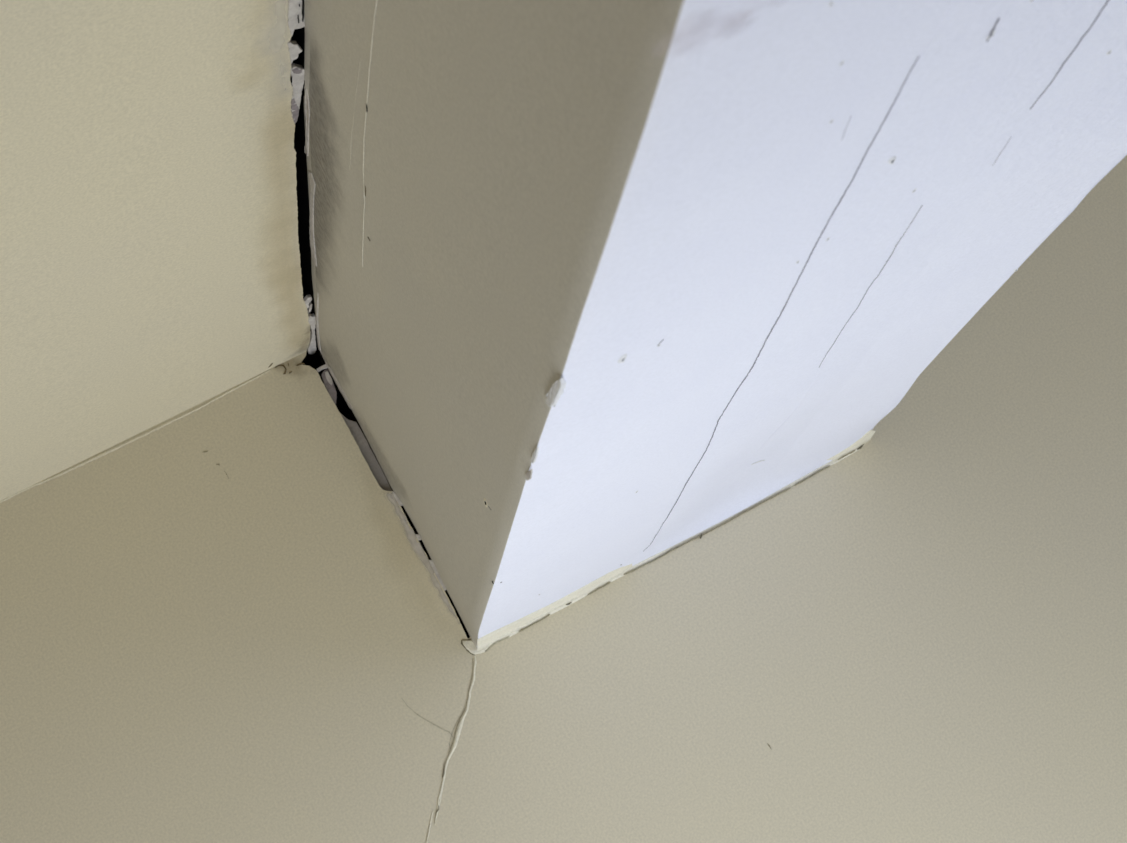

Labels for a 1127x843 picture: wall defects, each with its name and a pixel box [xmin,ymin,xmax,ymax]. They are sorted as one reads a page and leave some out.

crack [1030,0,1109,110]
crack [401,56,923,843]